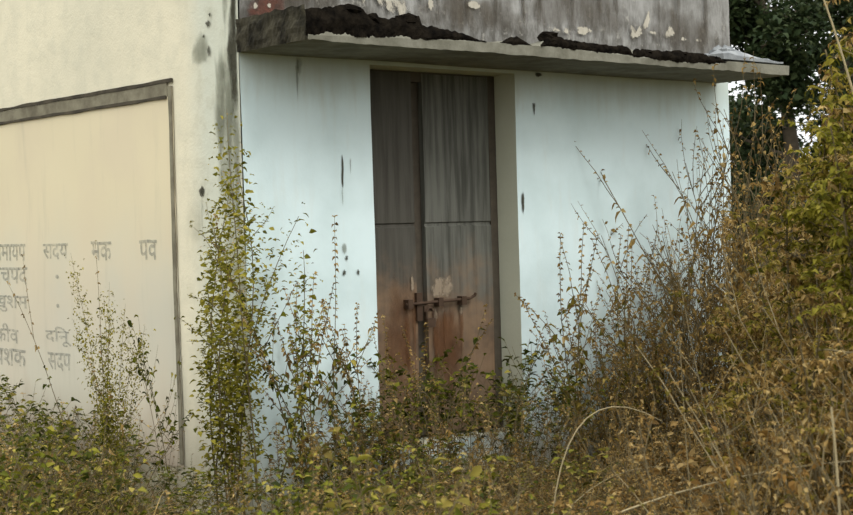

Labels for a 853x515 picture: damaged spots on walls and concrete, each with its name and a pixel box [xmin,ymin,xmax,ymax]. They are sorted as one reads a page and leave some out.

damp [219,0,237,123]
spalling [235,0,486,52]
spalling [500,11,726,64]